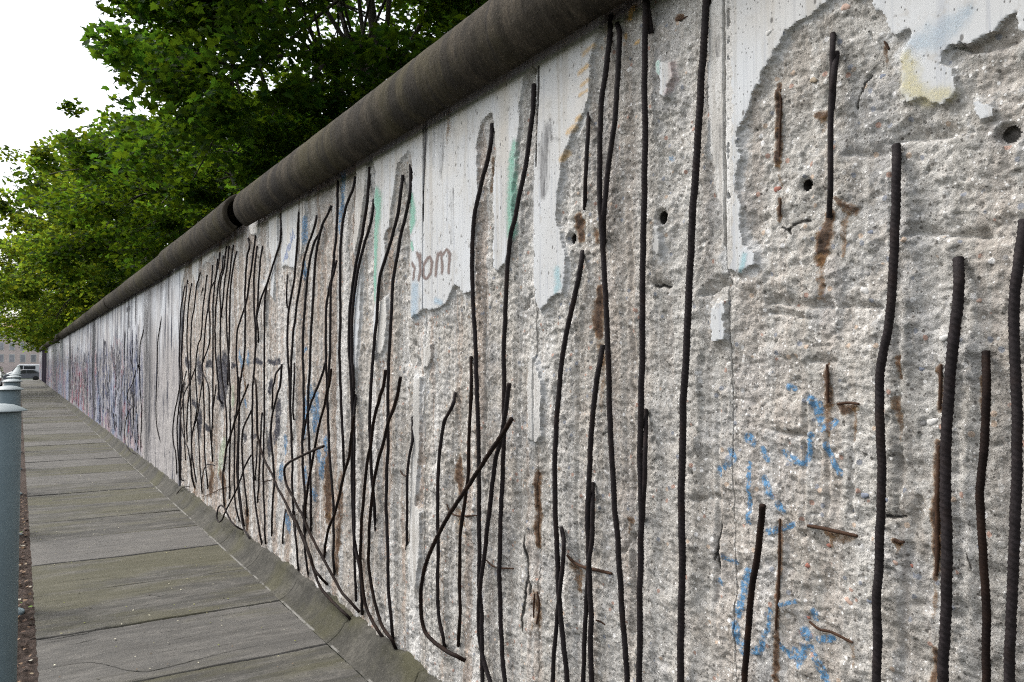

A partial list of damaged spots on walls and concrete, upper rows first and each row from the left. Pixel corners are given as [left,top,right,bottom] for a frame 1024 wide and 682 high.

corrosion [774,82,783,168]
corrosion [814,196,858,298]
spalling [172,207,303,545]
spalling [227,0,1024,682]
corrosion [823,363,858,441]
corrosion [533,470,543,548]
corrosion [929,439,941,608]